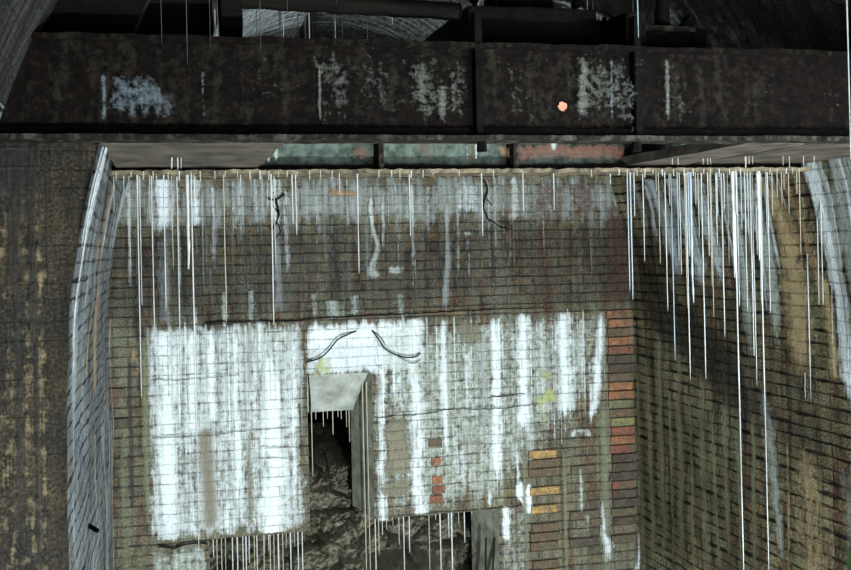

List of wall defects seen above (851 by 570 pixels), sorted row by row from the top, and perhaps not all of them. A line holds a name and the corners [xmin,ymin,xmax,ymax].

efflorescence [101,76,171,115]
crack [268,193,285,237]
crack [483,180,513,230]
efflorescence [804,157,851,402]
leakage [72,147,617,570]